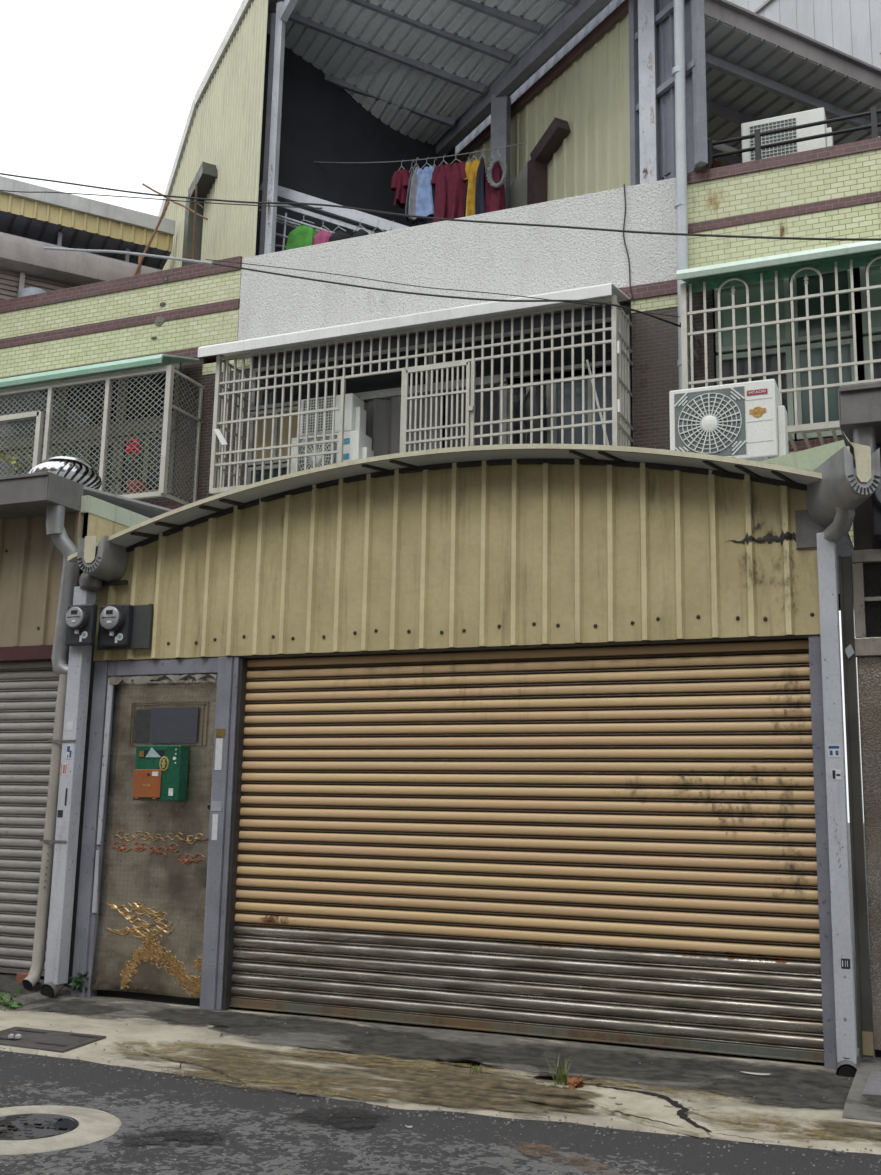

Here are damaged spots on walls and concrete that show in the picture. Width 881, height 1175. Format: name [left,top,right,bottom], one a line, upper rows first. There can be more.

water stain [0,974,881,1139]
crack [553,1081,772,1142]